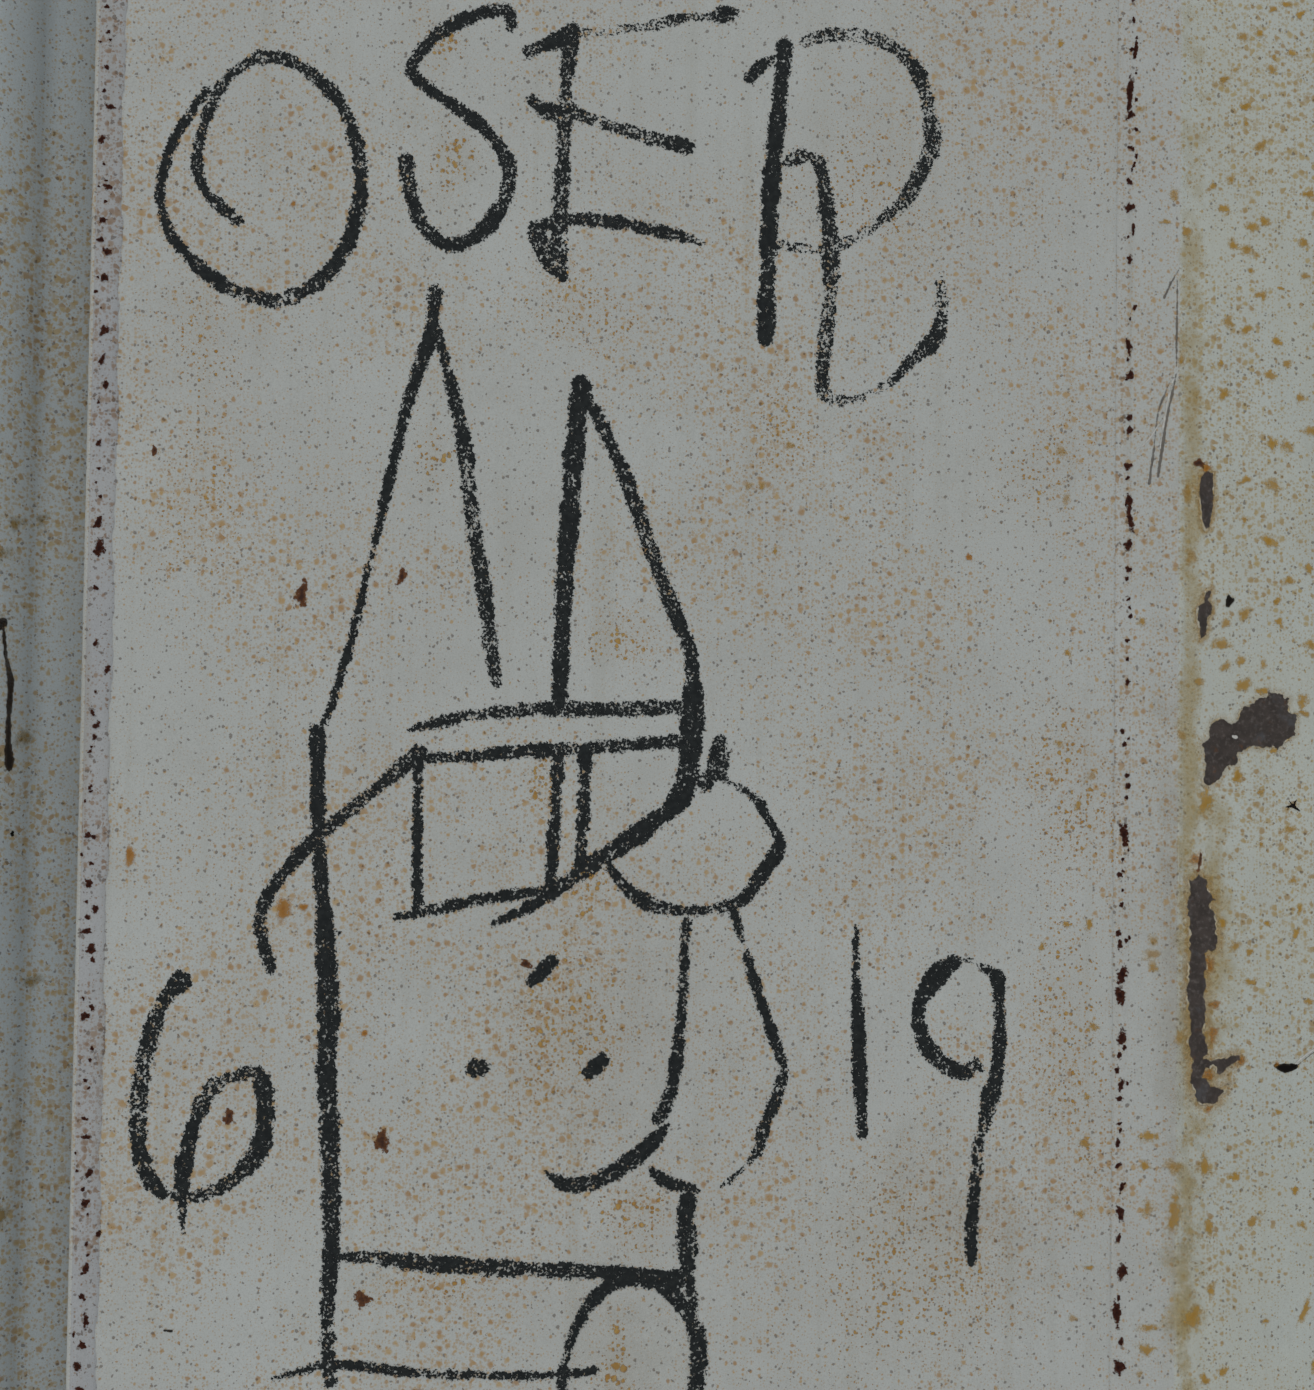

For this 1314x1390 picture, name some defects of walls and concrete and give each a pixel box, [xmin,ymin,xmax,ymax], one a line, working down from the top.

corrosion [1126,0,1156,185]
corrosion [96,163,113,255]
corrosion [1124,203,1135,264]
corrosion [91,516,106,557]
corrosion [1123,463,1144,625]
peeling [1199,679,1309,813]
corrosion [80,832,99,963]
corrosion [1011,684,1131,1243]
peeling [1185,852,1244,1111]
corrosion [74,1117,93,1215]
corrosion [72,1293,89,1390]
corrosion [1112,1262,1157,1376]